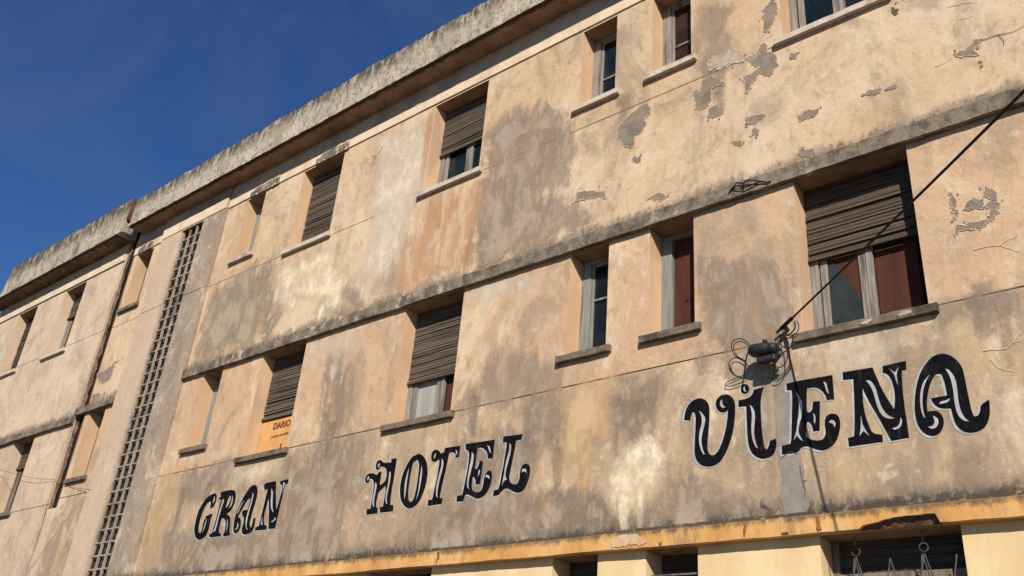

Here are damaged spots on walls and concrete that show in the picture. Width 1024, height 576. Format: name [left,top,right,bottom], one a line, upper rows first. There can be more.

peeling [693,0,800,121]
peeling [953,38,983,68]
peeling [616,103,651,163]
peeling [732,114,765,147]
peeling [798,106,822,122]
damp [471,102,592,268]
peeling [572,185,607,204]
peeling [948,186,1003,238]
damp [697,258,793,429]
damp [396,356,784,549]
peeling [611,533,646,548]
spalling [862,514,942,531]